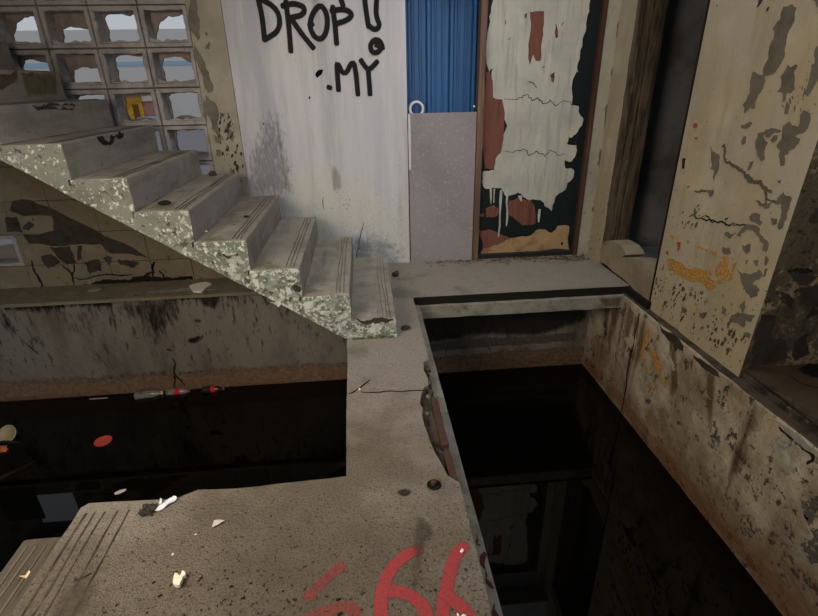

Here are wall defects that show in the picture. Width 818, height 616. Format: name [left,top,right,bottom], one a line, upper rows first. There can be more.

peeling [525,11,544,64]
peeling [741,4,818,184]
crack [721,143,780,206]
crack [689,214,746,227]
crack [31,260,43,287]
water stain [2,302,112,335]
crack [62,261,193,285]
spalling [0,282,348,386]
water stain [145,287,220,308]
water stain [0,364,348,402]
spalling [429,180,818,616]
water stain [731,413,755,474]